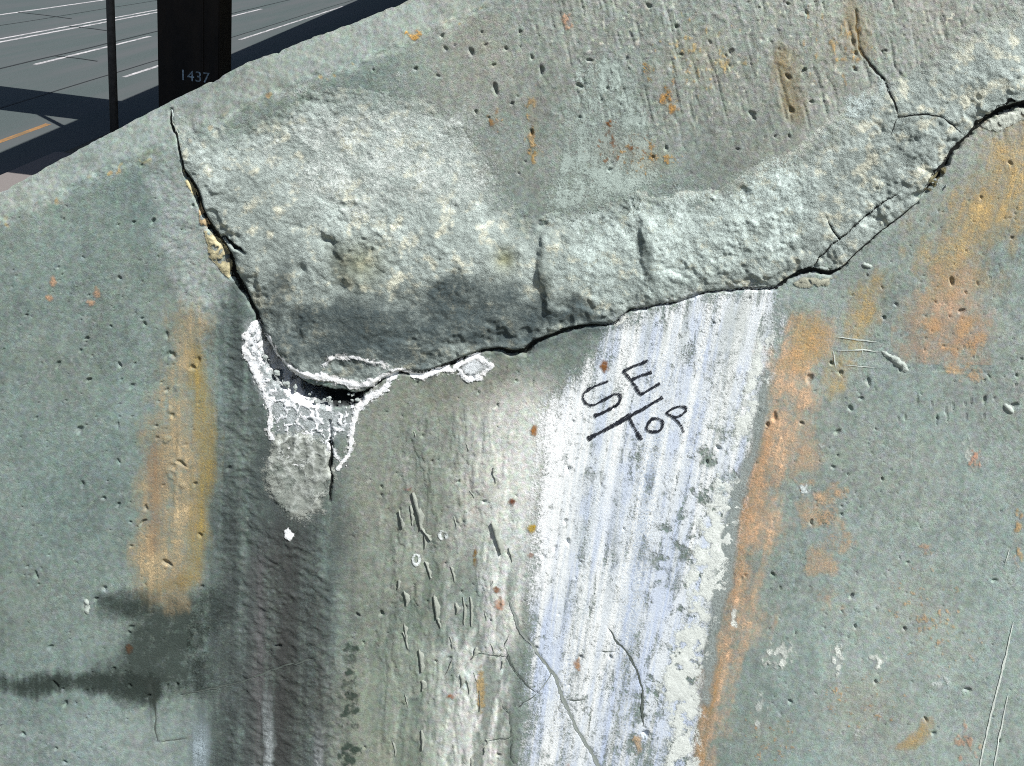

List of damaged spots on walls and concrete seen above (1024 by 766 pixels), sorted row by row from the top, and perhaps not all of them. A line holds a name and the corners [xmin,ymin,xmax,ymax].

crack [170,110,264,329]
crack [365,13,1024,392]
leakage [819,79,891,144]
rust [916,143,1024,359]
rust [133,397,212,601]
crack [327,430,335,499]
leakage [0,55,821,766]
rust [746,330,817,548]
crack [482,598,600,766]
crack [603,626,644,725]
rust [710,589,756,703]